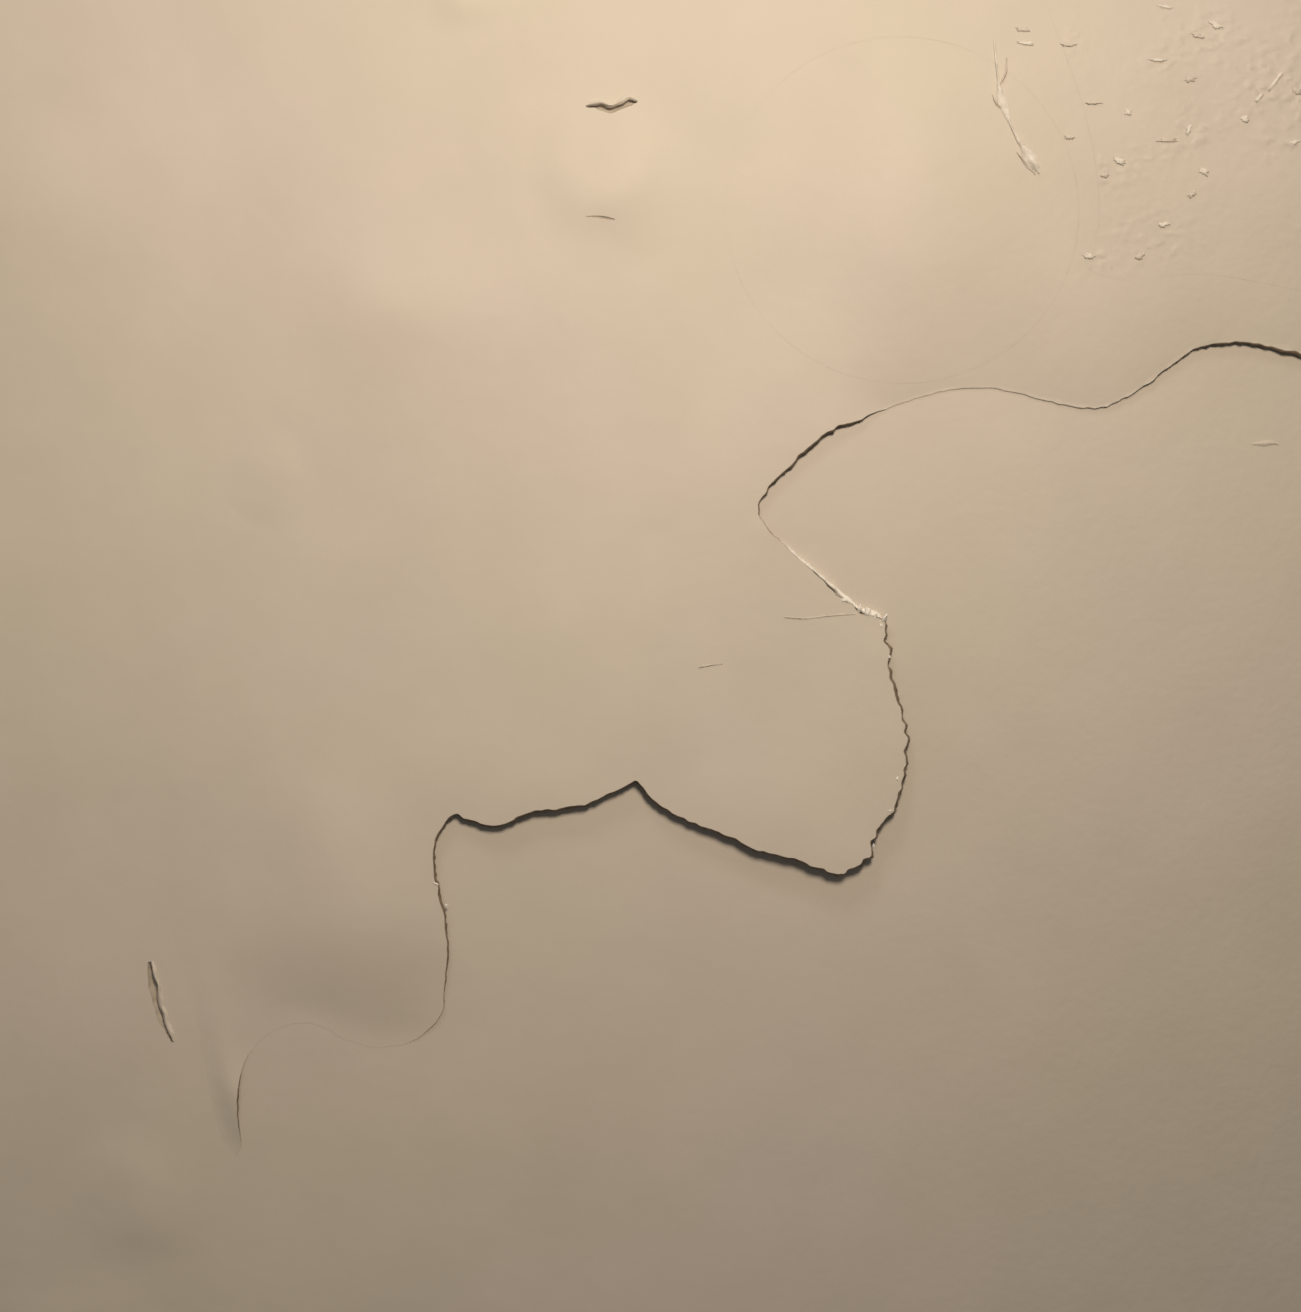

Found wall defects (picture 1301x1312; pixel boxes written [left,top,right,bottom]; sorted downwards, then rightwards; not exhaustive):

crack [586,95,638,113]
flaking render [160,0,1301,1158]
crack [147,961,175,1042]